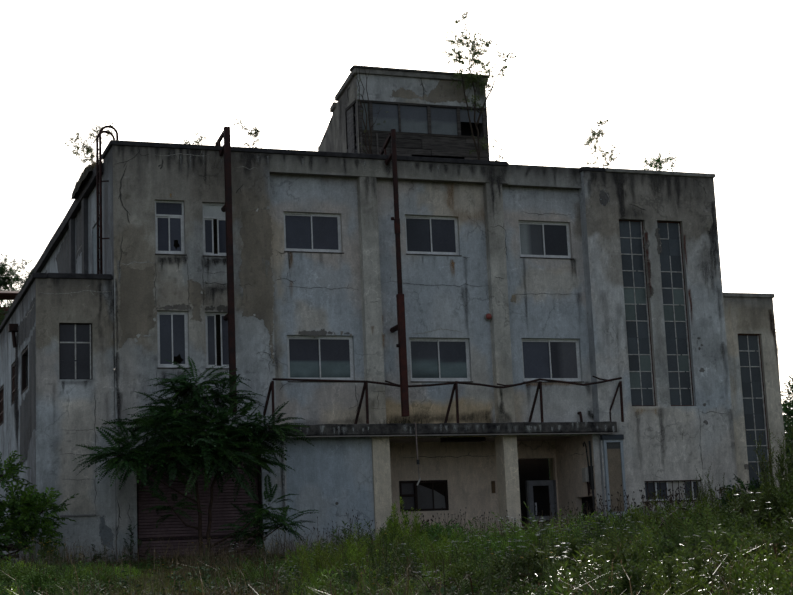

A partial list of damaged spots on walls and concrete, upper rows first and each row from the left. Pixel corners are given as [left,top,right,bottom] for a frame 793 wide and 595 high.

crack [117,150,209,298]
leakage [588,172,634,219]
leakage [650,174,680,203]
leakage [702,202,718,278]
peeling [238,206,275,363]